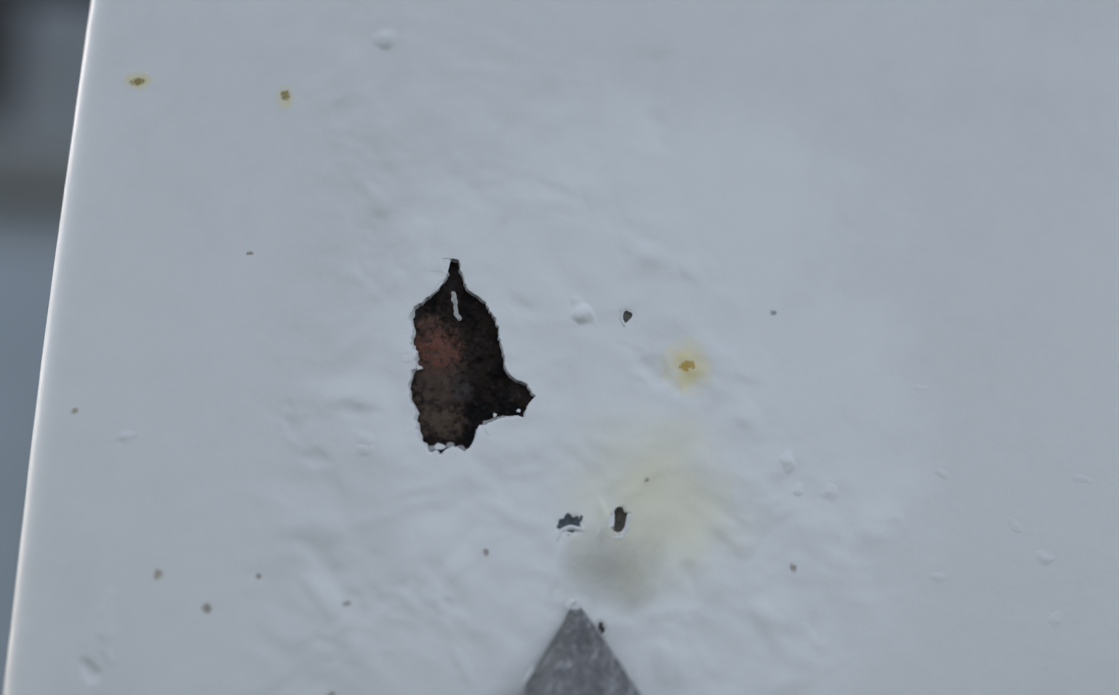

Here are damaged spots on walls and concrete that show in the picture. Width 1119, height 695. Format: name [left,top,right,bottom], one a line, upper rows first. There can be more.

rust [121,70,154,92]
rust [274,83,297,114]
peeling [394,247,548,469]
rust [539,333,769,619]
peeling [556,513,585,541]
peeling [611,507,631,539]